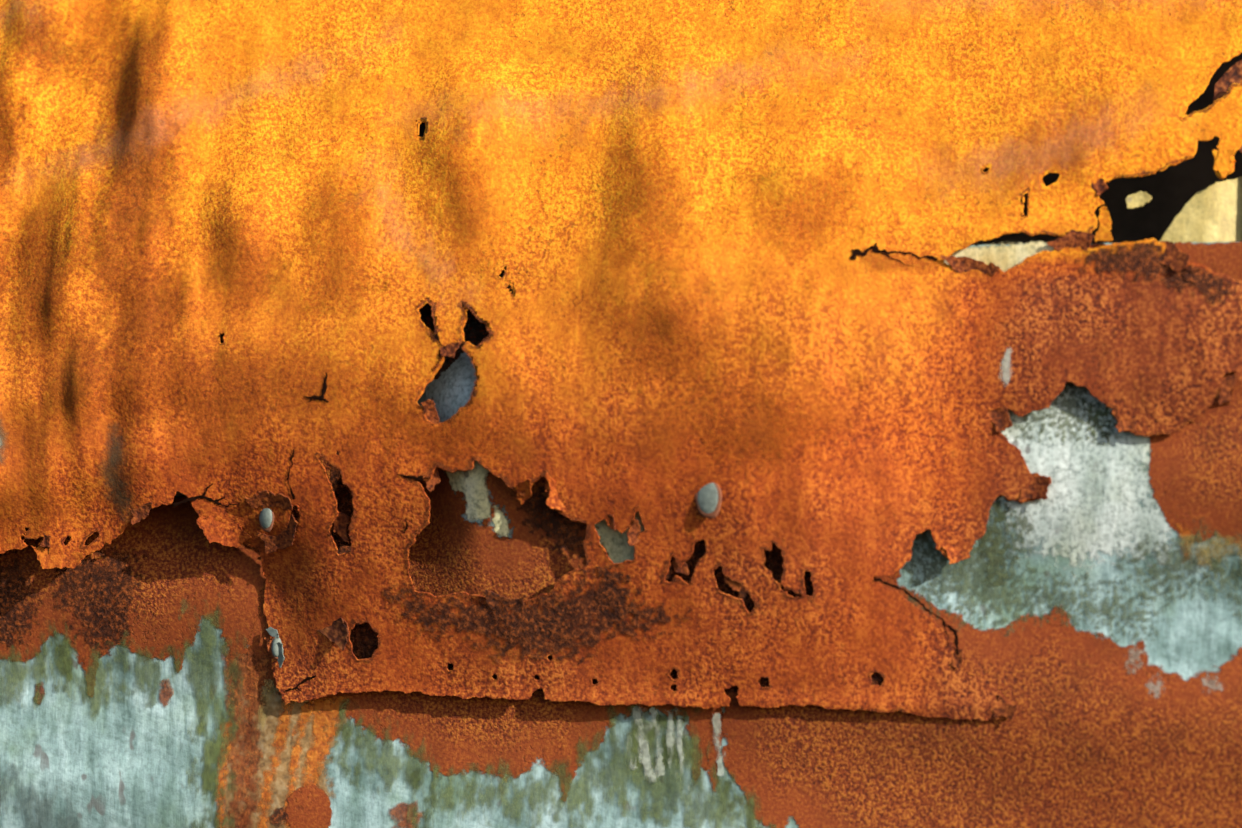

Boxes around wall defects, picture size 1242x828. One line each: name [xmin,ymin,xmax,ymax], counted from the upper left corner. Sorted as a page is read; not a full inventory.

peeling [1212,149,1236,178]
peeling [940,156,1192,276]
rust [1076,240,1242,304]
rust [419,304,436,333]
rust [434,310,489,379]
peeling [421,342,477,424]
peeling [423,461,509,537]
peeling [515,472,565,512]
peeling [594,511,644,563]
peeling [987,382,1195,567]
rust [1149,371,1242,556]
rust [0,452,1242,828]